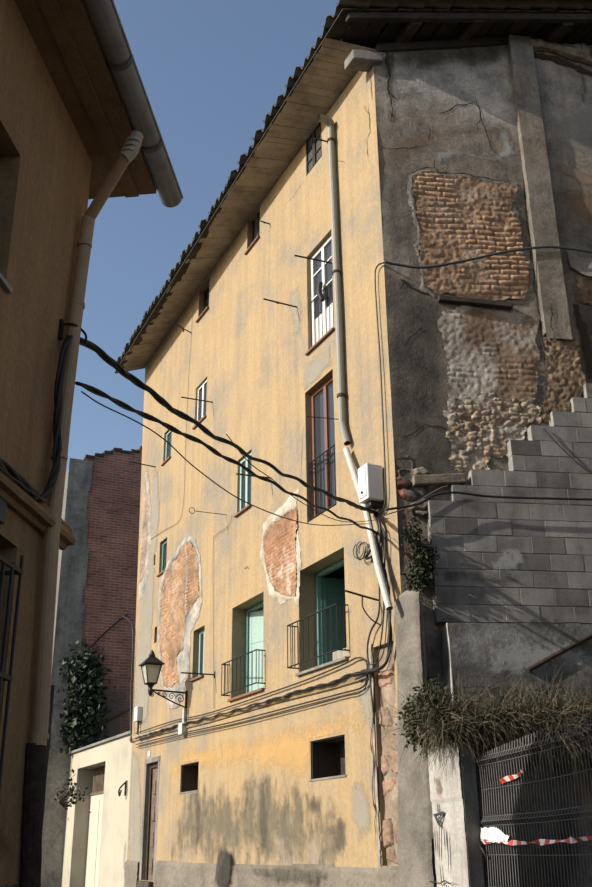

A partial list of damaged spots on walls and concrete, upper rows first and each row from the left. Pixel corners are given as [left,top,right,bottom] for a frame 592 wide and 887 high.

crack [364,52,555,404]
flaking render [395,169,586,516]
spalling [567,250,592,305]
crack [573,304,592,378]
flaking render [158,534,202,709]
flaking render [260,489,301,605]
water stain [178,779,345,887]
spalling [369,643,398,866]